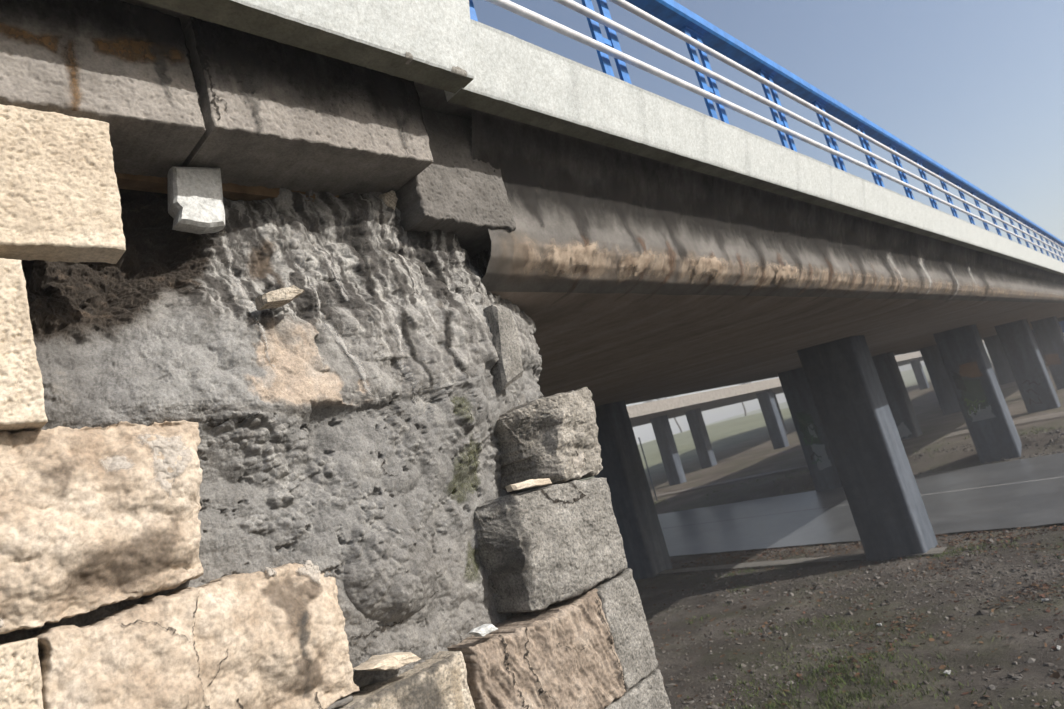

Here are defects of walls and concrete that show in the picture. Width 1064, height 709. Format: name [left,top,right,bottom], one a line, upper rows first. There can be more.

corrosion [0,23,80,111]
corrosion [93,37,184,63]
crack [186,49,228,121]
water stain [473,146,1064,299]
spalling [26,188,543,687]
spalling [573,453,584,468]
crack [122,597,228,709]
water stain [263,578,322,695]
crack [499,626,556,709]
crack [558,597,626,688]